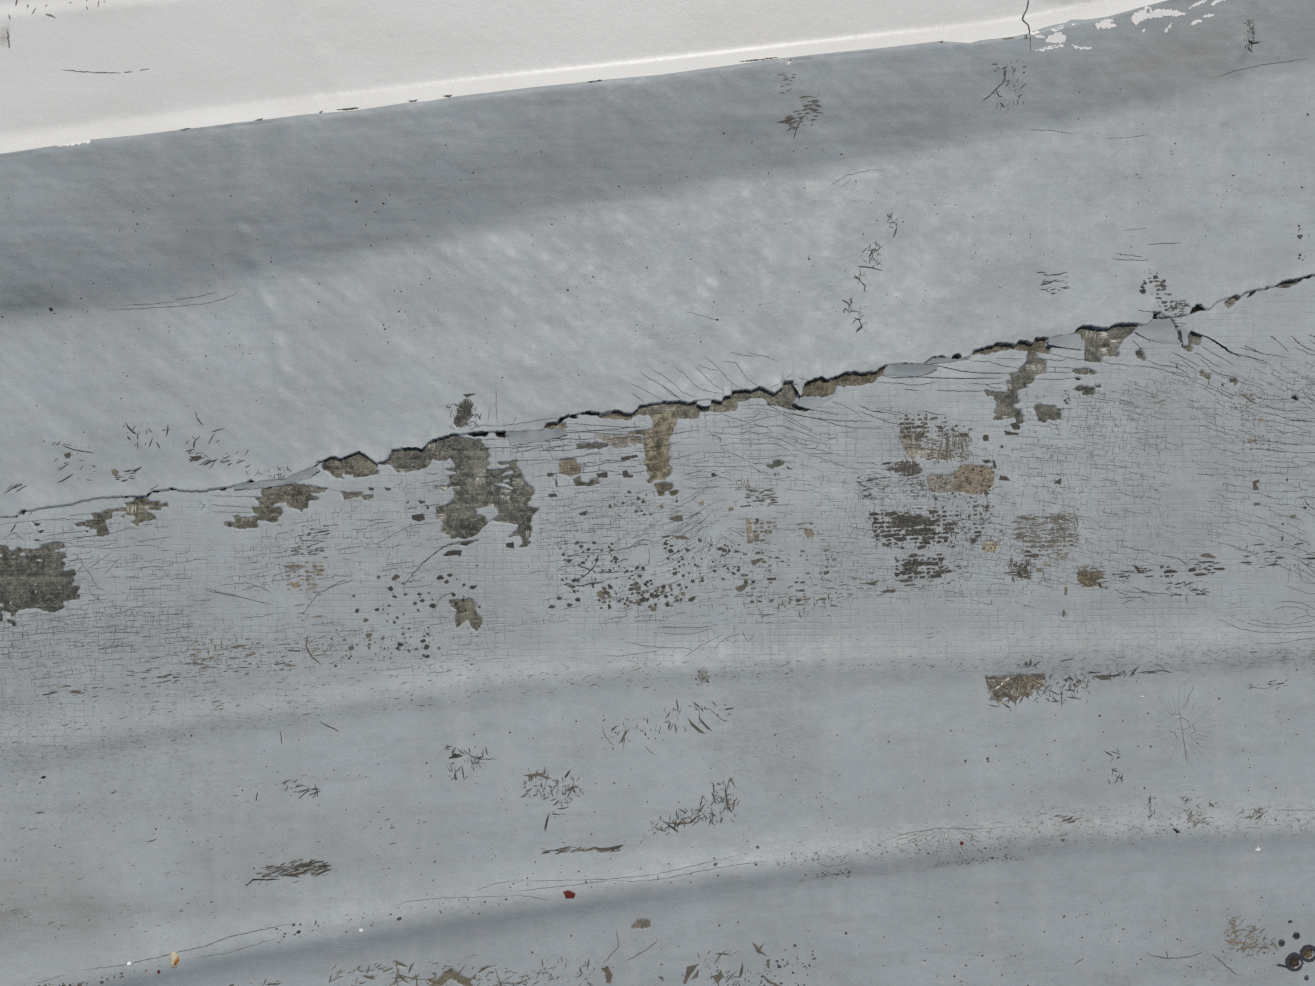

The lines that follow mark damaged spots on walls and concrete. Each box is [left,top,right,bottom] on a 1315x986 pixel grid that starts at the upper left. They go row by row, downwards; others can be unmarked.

peeling [1002,23,1091,52]
peeling [1095,0,1225,32]
peeling [1200,371,1315,454]
peeling [0,523,80,626]
peeling [43,351,1225,695]
crack [0,266,1315,703]
peeling [1240,506,1315,568]
peeling [985,659,1139,708]